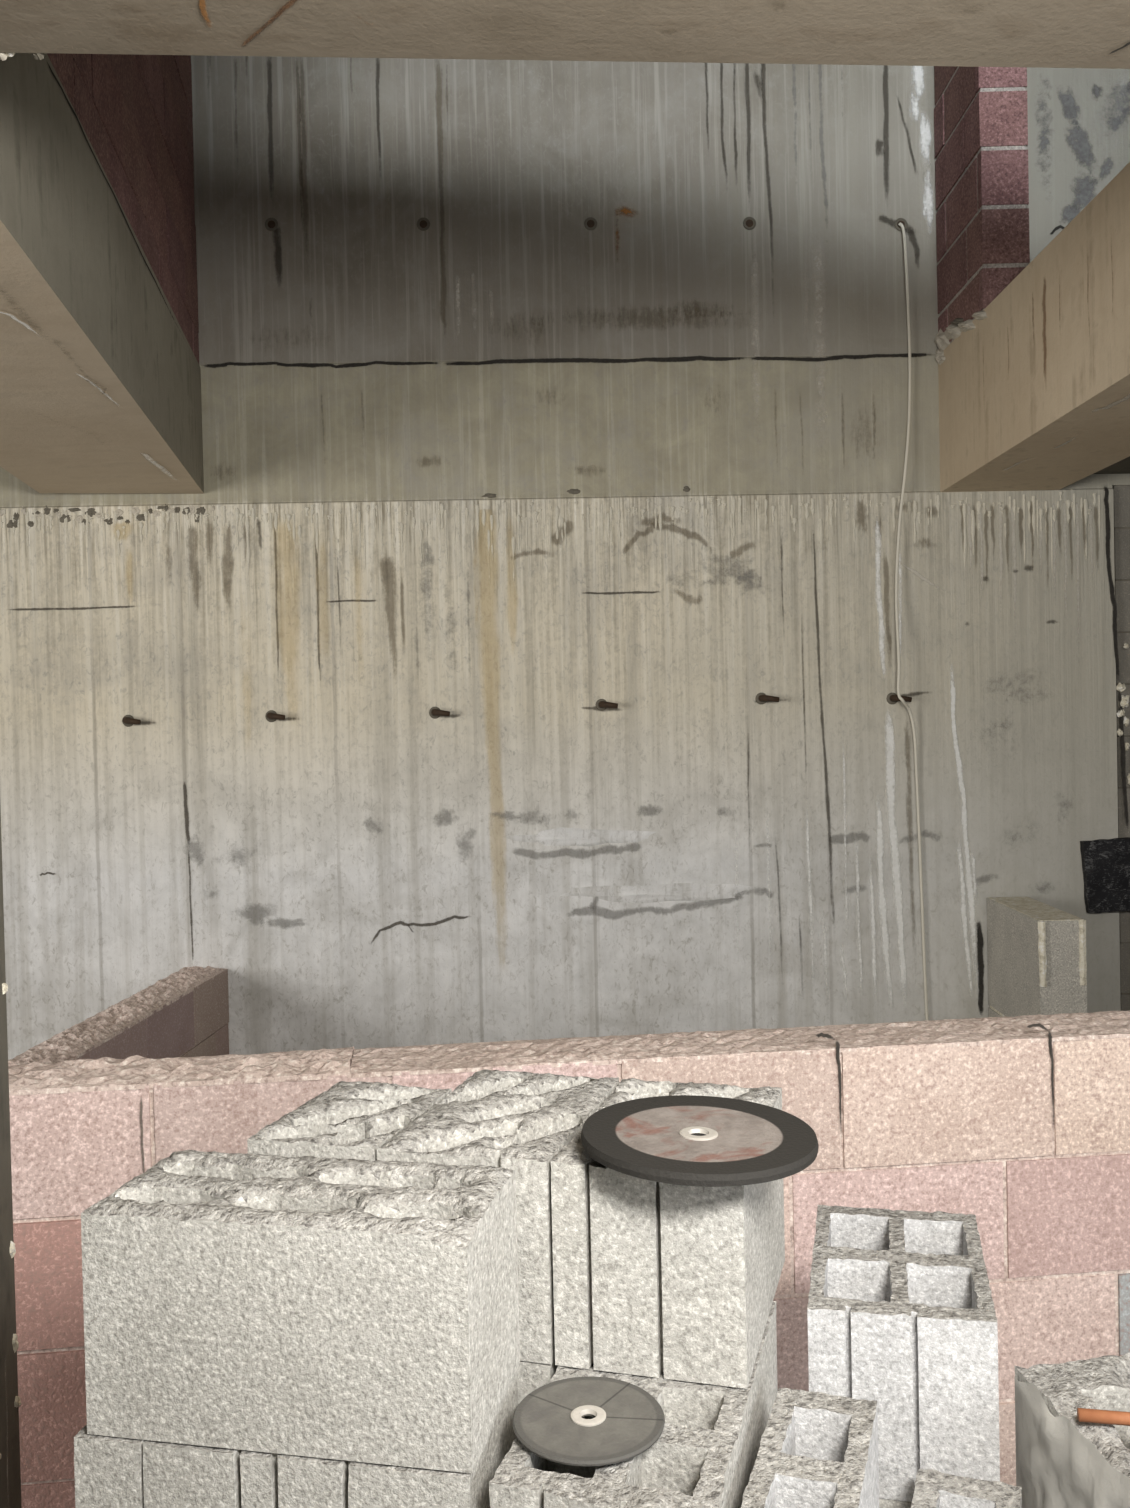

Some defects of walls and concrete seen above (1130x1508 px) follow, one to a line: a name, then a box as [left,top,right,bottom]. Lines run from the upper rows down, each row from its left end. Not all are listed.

crack [246,0,296,44]
leakage [1,491,1101,1002]
crack [372,915,468,942]